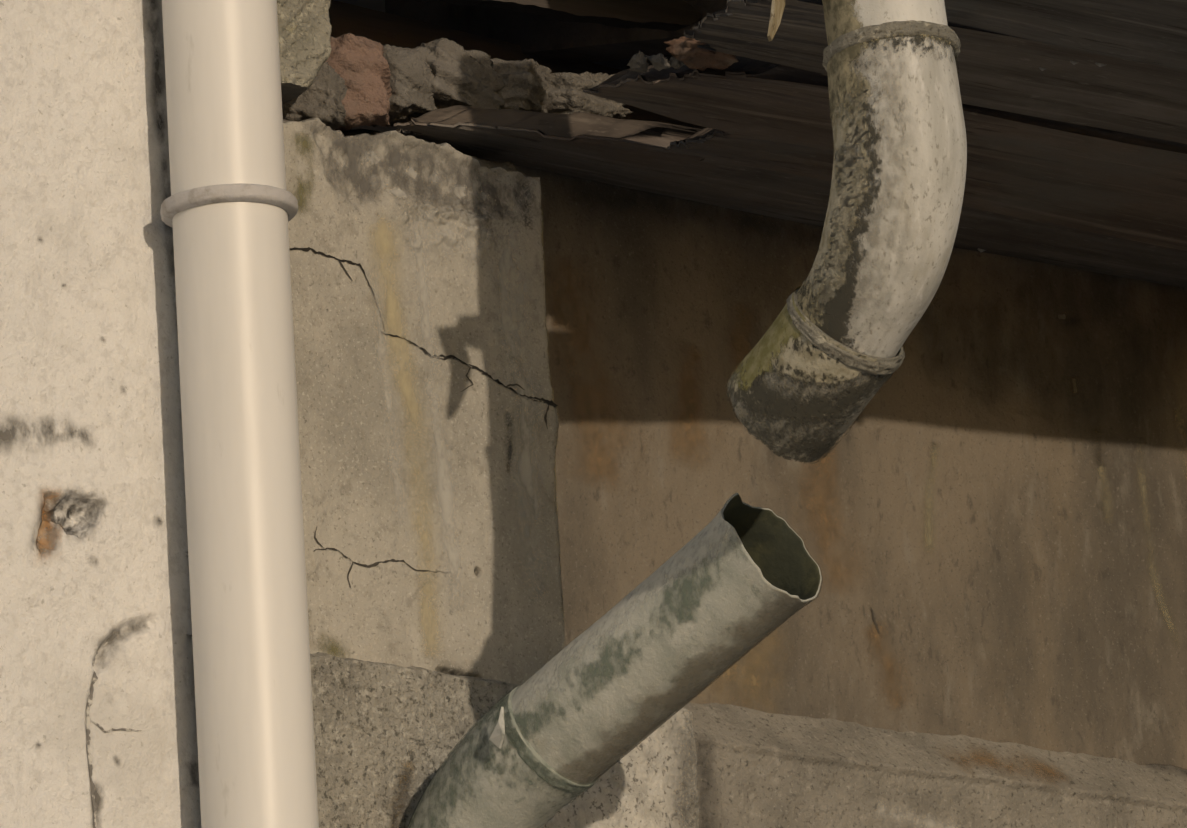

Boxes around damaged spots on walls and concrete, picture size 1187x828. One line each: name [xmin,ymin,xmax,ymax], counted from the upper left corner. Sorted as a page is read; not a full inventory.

peeling [329,131,517,219]
crack [289,247,558,429]
spalling [36,495,95,553]
crack [313,527,451,588]
crack [86,643,142,828]